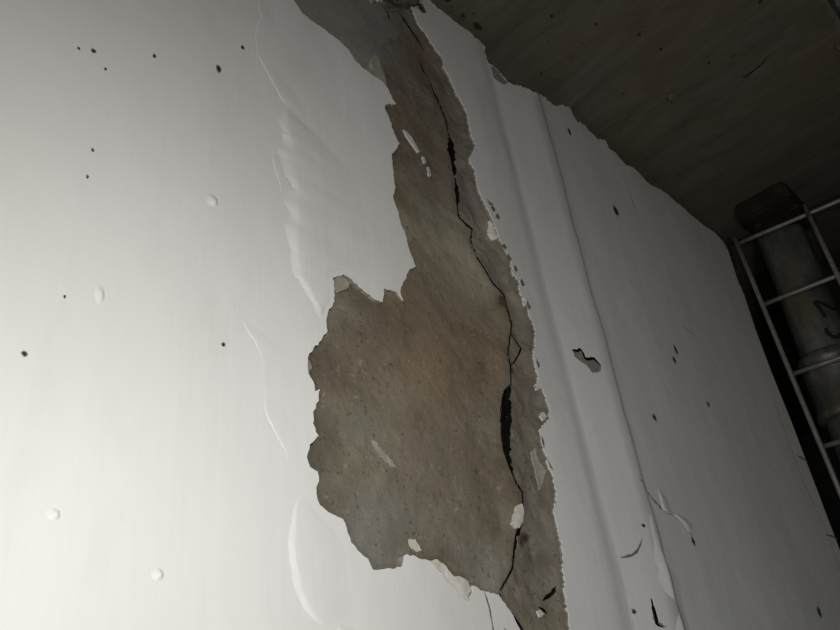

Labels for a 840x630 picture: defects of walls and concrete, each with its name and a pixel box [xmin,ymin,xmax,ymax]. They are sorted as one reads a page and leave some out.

flaking render [294,0,568,630]
crack [387,12,524,630]
crack [538,586,556,614]
peeling [572,348,601,373]